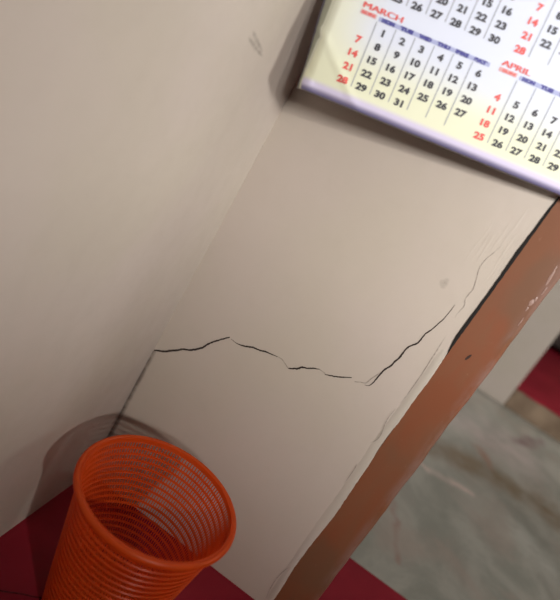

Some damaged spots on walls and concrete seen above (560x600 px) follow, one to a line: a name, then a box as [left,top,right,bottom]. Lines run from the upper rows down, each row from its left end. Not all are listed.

crack [154,337,277,357]
crack [366,305,455,386]
crack [288,366,352,378]